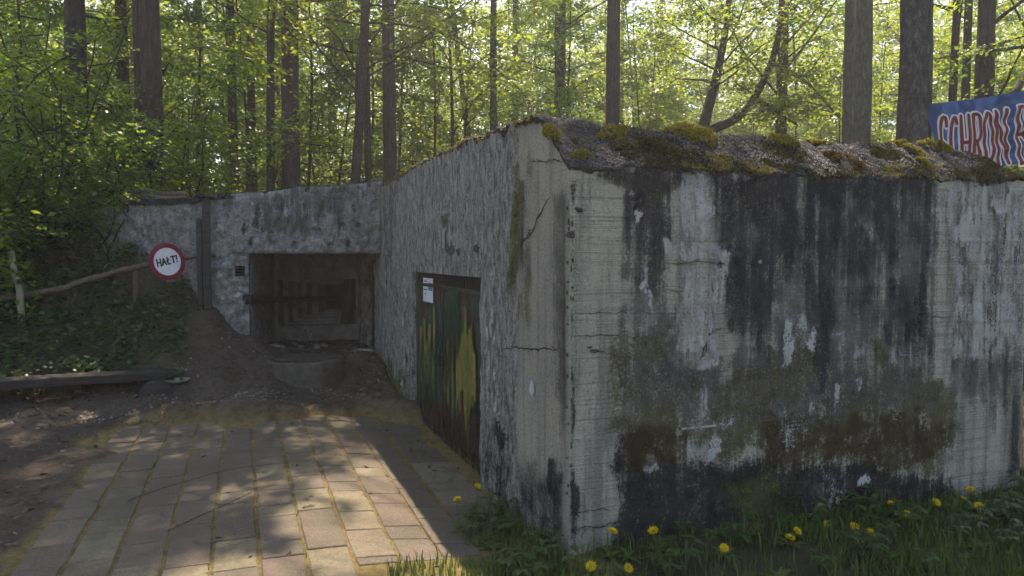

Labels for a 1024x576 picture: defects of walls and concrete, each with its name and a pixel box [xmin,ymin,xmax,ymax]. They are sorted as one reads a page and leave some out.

crack [512,199,549,259]
crack [501,261,768,372]
damp [597,166,937,411]
damp [479,418,580,545]
damp [610,387,960,545]